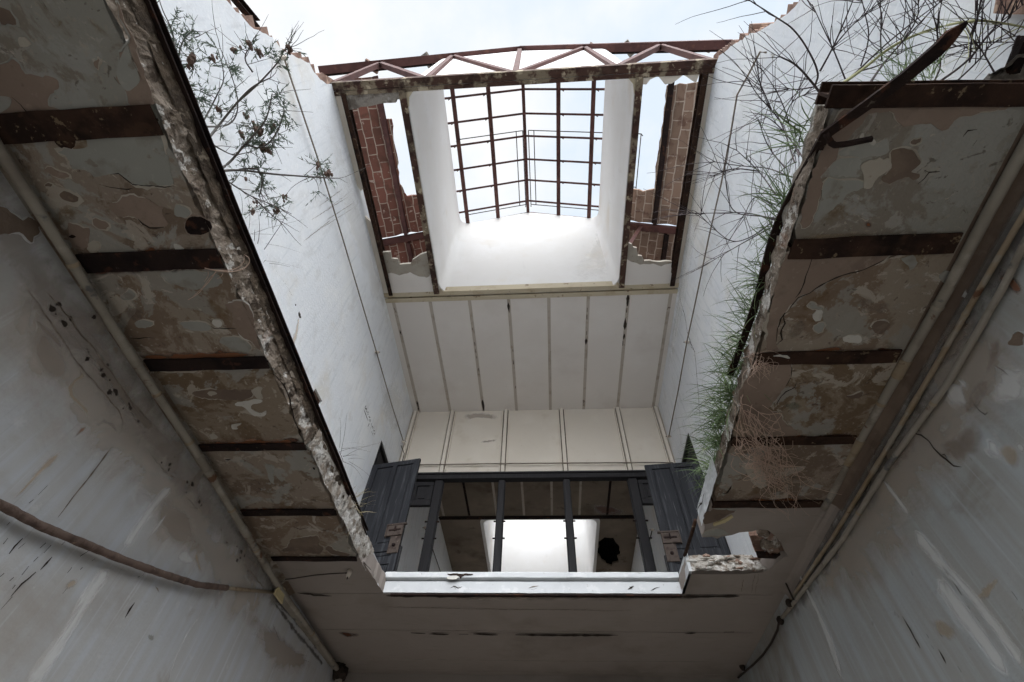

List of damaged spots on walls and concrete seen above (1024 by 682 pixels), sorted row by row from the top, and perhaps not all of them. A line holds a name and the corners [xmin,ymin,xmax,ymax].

flaking render [0,7,59,113]
flaking render [115,0,155,106]
flaking render [54,133,174,190]
flaking render [800,107,1009,229]
spalling [0,205,40,245]
spalling [174,204,212,236]
flaking render [160,269,223,290]
rust [142,350,249,359]
flaking render [179,299,261,354]
flaking render [738,251,918,437]
crack [776,255,897,345]
peeling [235,387,267,417]